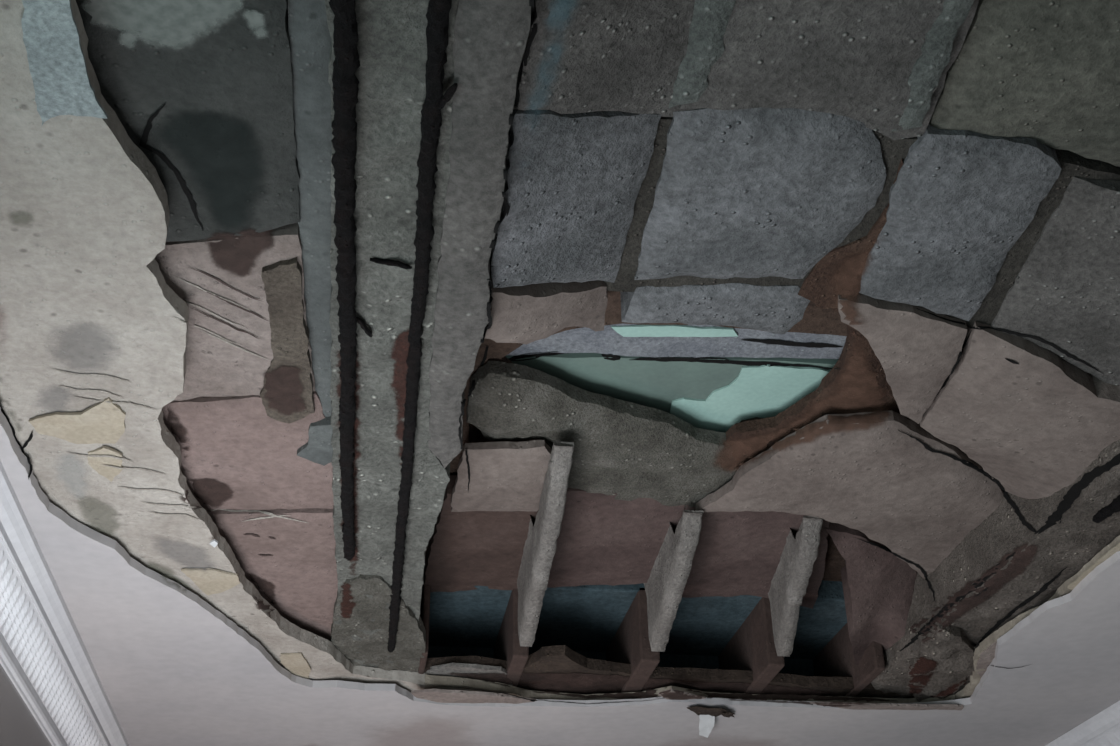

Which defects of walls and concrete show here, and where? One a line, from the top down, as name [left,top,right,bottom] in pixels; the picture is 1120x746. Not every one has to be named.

crack [139,103,203,231]
water stain [163,114,273,277]
spalling [0,0,742,704]
crack [917,308,1103,399]
spalling [1092,495,1120,523]
spalling [750,535,1120,710]
peeling [687,706,735,738]